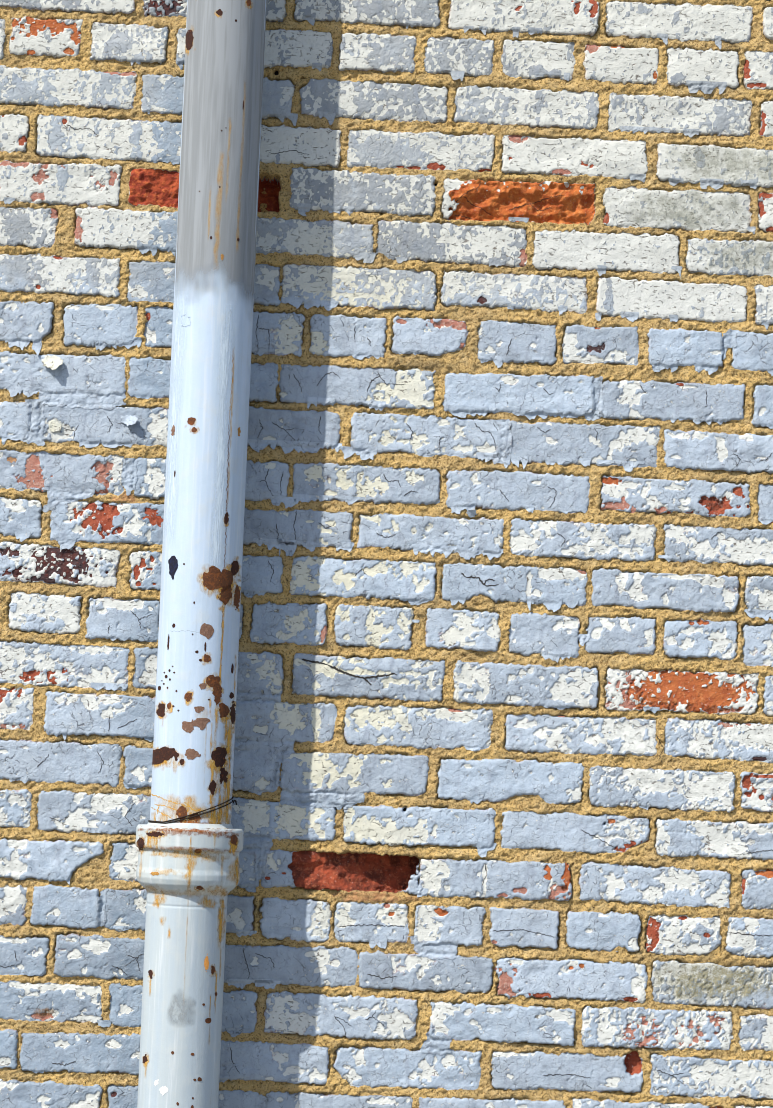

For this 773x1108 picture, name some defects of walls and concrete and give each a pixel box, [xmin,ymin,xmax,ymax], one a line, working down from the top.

peeling [0,0,194,363]
spalling [252,0,773,375]
peeling [0,323,63,373]
rust [137,699,238,942]
rust [219,608,236,699]
peeling [47,332,773,1108]
peeling [0,1079,19,1094]
peeling [0,889,153,1049]